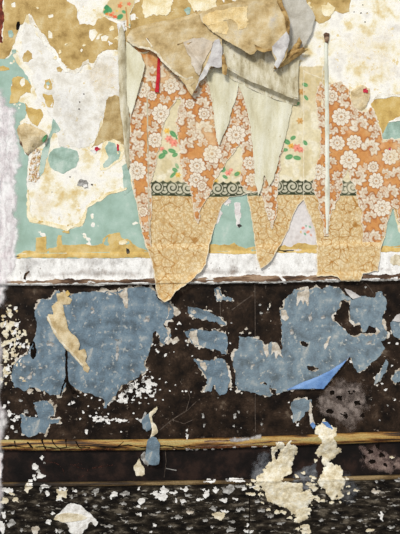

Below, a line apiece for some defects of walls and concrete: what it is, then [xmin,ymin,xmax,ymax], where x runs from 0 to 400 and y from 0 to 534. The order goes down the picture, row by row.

peeling [306,0,351,24]
peeling [0,0,236,154]
peeling [371,93,400,134]
peeling [276,201,318,254]
peeling [208,243,256,254]
peeling [0,274,400,466]
water stain [321,381,365,420]
water stain [360,443,400,471]
peeling [0,511,16,534]
peeling [0,488,19,504]
peeling [24,455,130,534]
peeling [151,478,256,533]